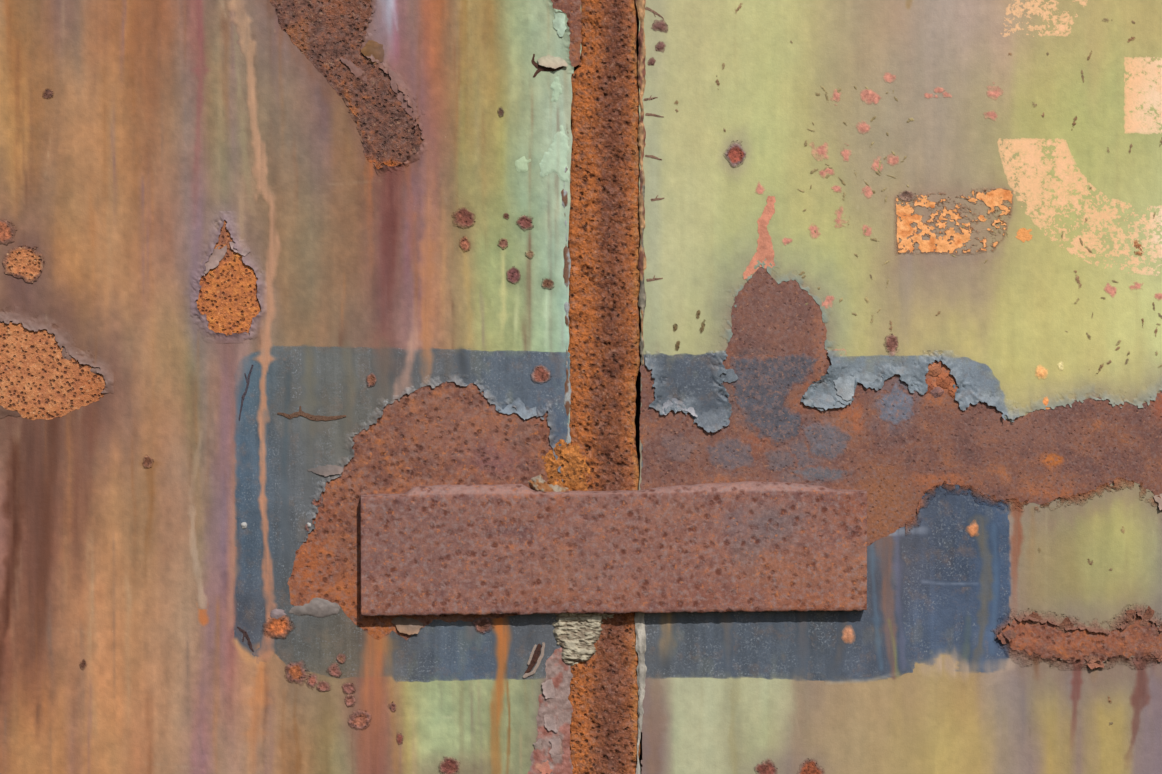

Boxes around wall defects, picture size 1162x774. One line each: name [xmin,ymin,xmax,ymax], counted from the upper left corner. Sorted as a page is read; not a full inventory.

spalling [0,218,45,283]
peeling [893,187,1033,256]
peeling [1104,282,1162,301]
corrosion [270,0,591,774]
spalling [884,333,900,357]
peeling [1035,361,1064,380]
corrosion [639,258,1162,771]
peeling [965,520,979,537]
corrosion [224,503,269,670]
peeling [527,647,573,774]